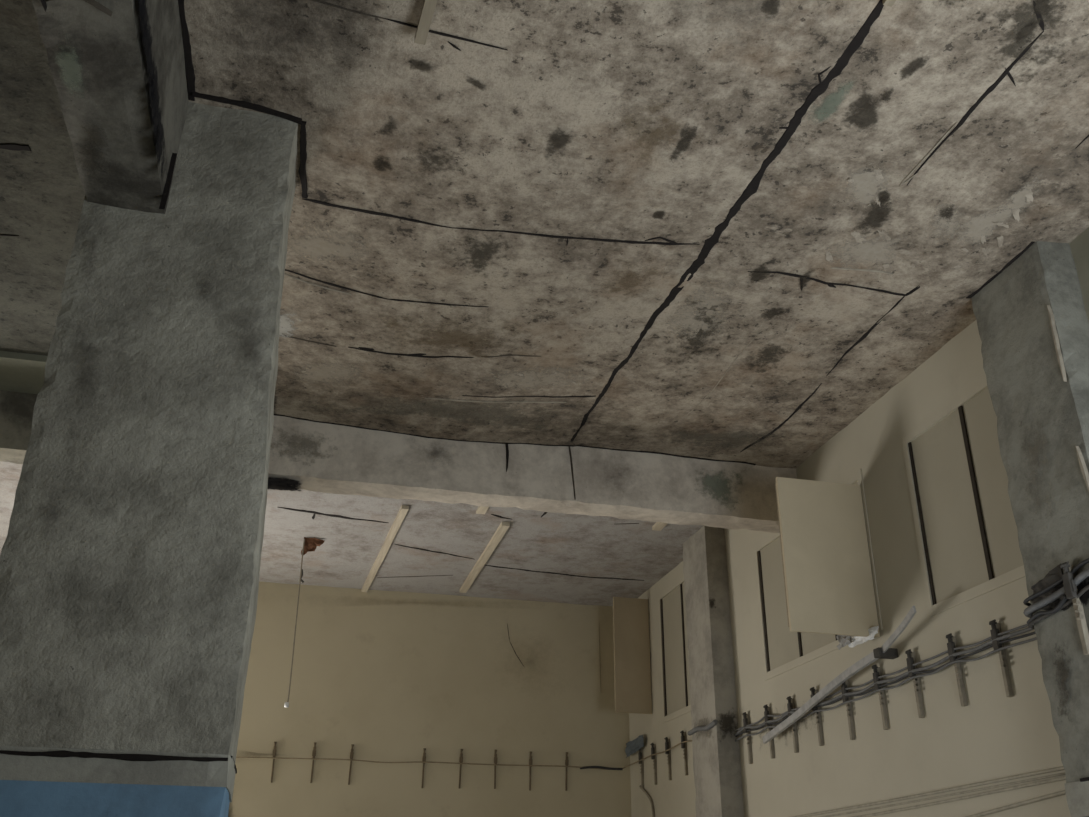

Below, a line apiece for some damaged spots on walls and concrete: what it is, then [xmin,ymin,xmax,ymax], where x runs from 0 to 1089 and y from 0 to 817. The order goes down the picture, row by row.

crack [83,0,112,16]
crack [899,1,1044,186]
crack [0,143,31,151]
crack [159,153,177,209]
crack [178,0,920,499]
crack [966,241,1035,299]
crack [0,750,237,774]